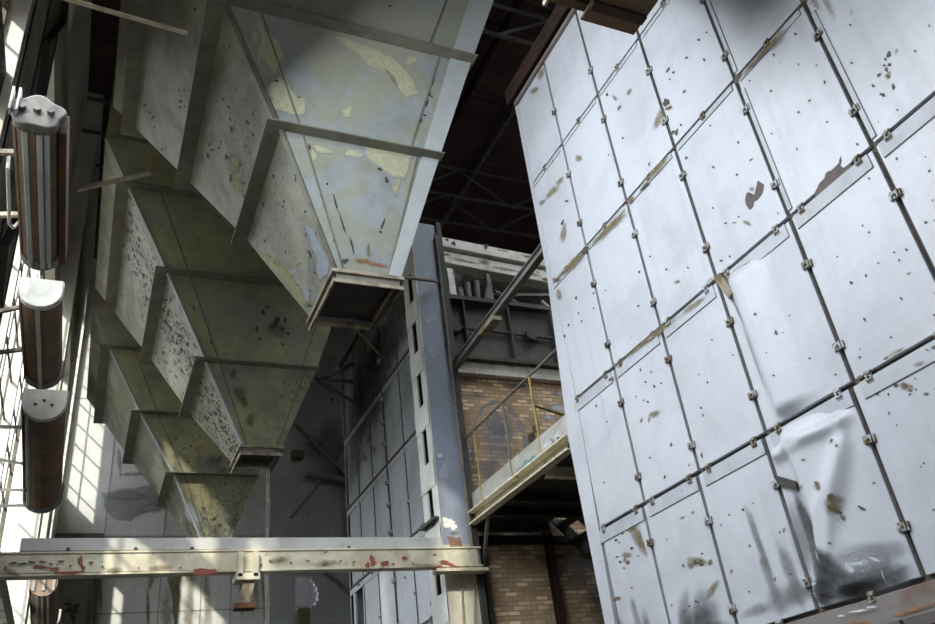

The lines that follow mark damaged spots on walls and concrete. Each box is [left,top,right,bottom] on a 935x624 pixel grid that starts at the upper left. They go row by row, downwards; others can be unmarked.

peeling [345,146,412,193]
peeling [745,181,764,210]
peeling [814,157,851,196]
peeling [232,168,330,307]
water stain [163,576,210,624]